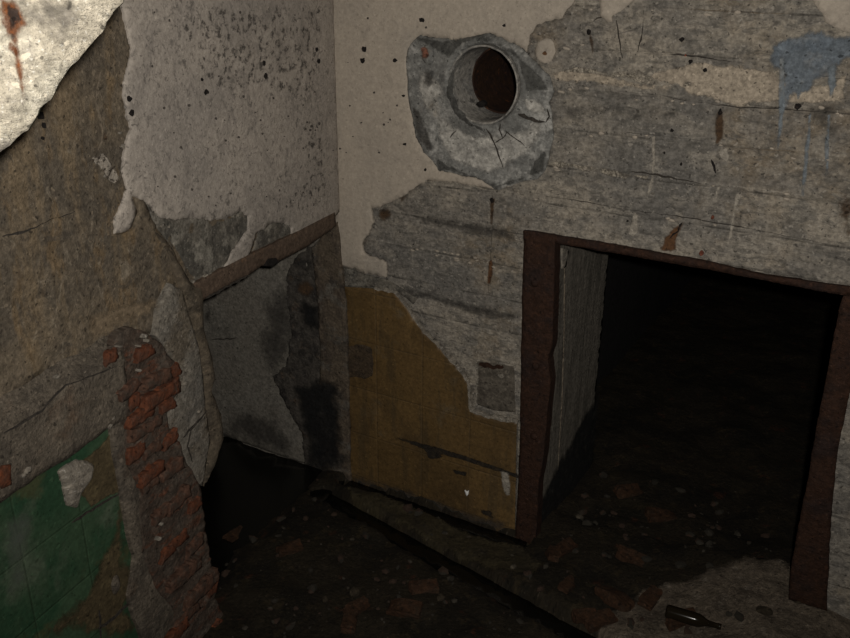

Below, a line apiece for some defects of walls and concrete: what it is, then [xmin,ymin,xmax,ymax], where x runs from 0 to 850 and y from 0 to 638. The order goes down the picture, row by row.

rust [2,1,25,89]
crack [486,109,550,169]
peeling [345,0,850,421]
rust [662,222,683,251]
peeling [0,6,247,638]
crack [4,367,114,434]
peeling [827,395,850,619]